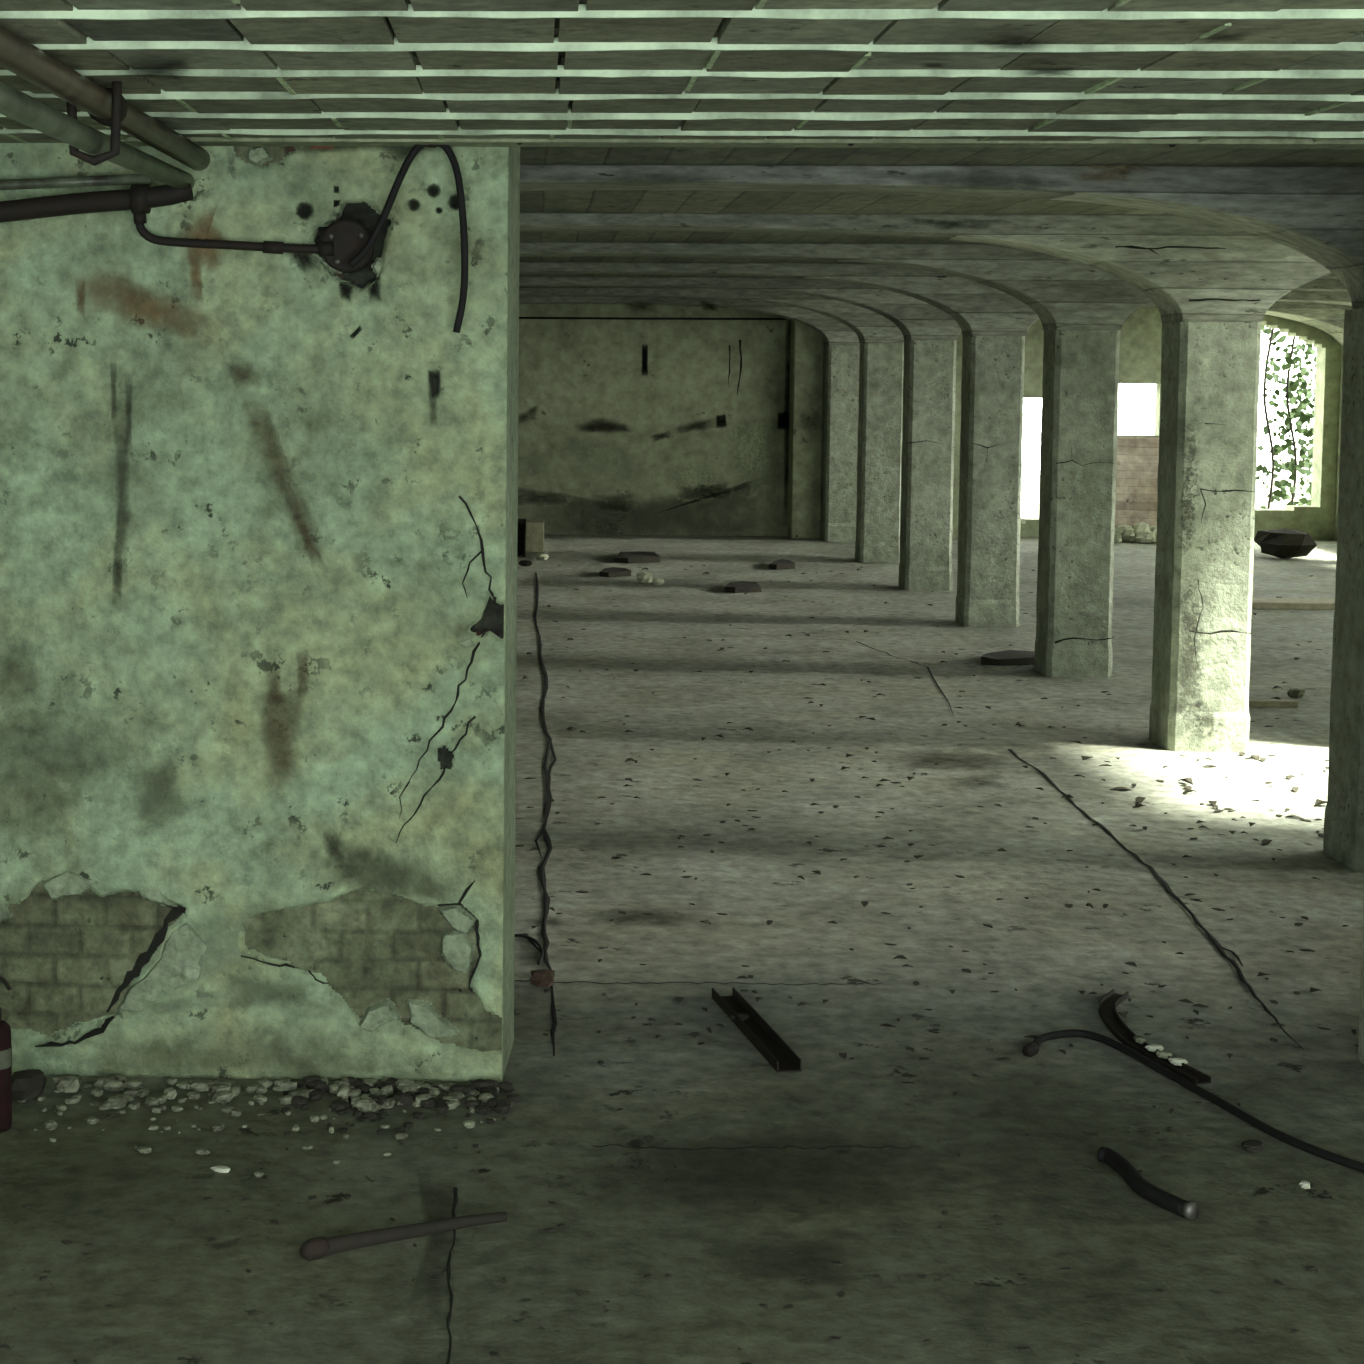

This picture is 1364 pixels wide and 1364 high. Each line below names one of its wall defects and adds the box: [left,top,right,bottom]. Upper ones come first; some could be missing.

damp [112,376,130,540]
crack [388,496,497,843]
crack [856,641,954,717]
crack [515,572,882,1056]
spalling [0,871,208,1037]
spalling [242,890,502,1052]
crack [1007,749,1303,1049]